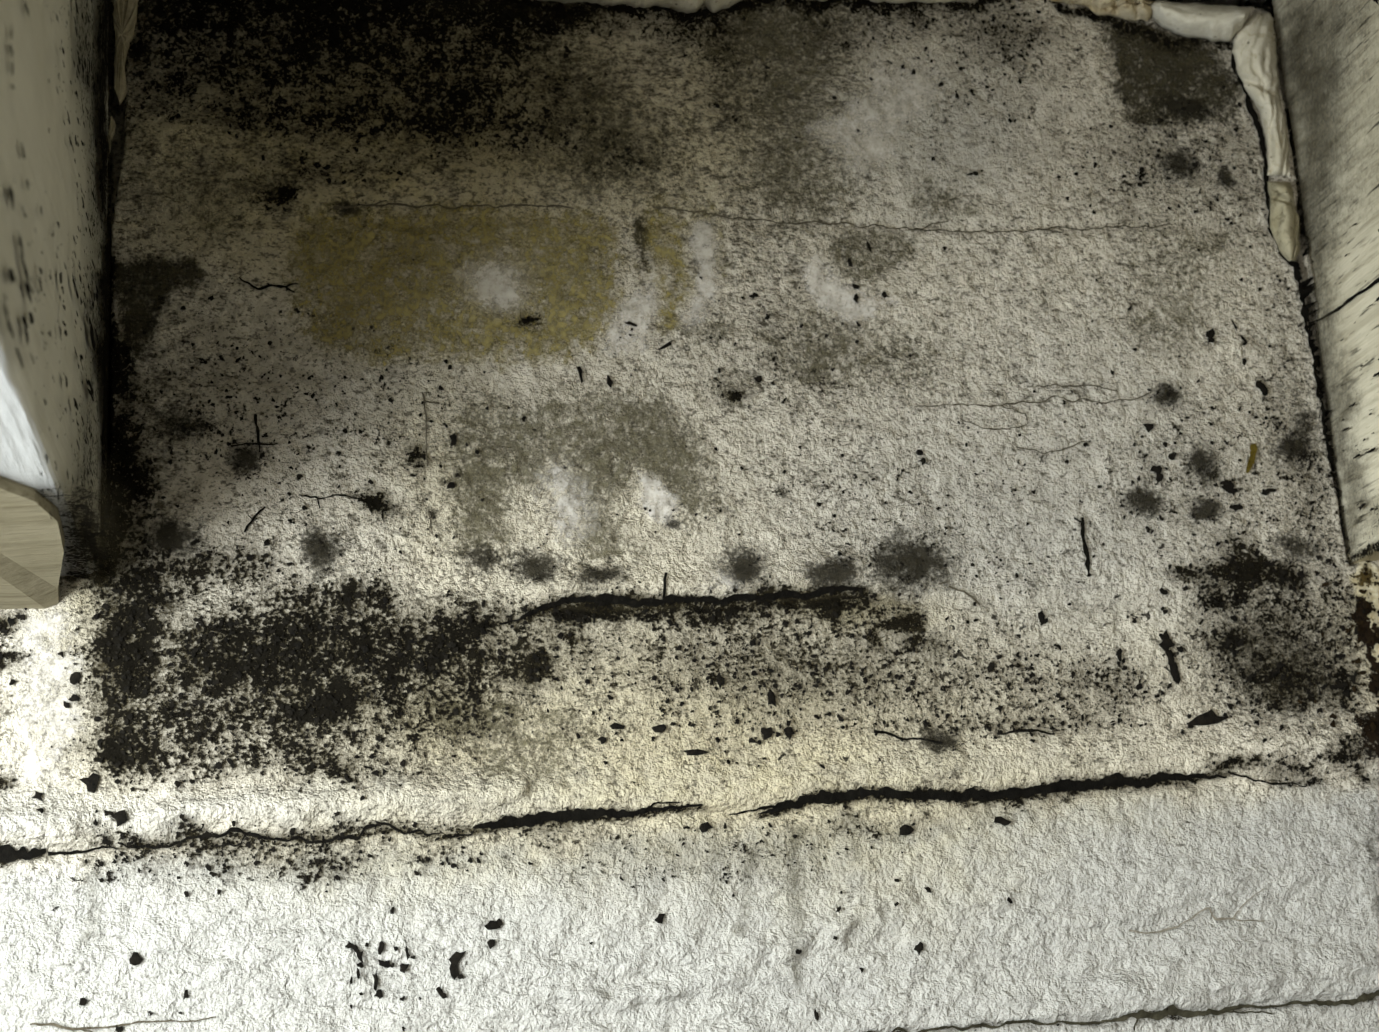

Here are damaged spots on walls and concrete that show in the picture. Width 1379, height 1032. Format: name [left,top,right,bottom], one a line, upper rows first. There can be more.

water stain [16,0,1379,801]
water stain [0,608,31,669]
crack [499,572,867,625]
peeling [1293,545,1379,738]
water stain [0,774,20,792]
water stain [64,803,483,897]
crack [0,768,1306,868]
water stain [497,805,947,897]
rust [1350,707,1379,774]